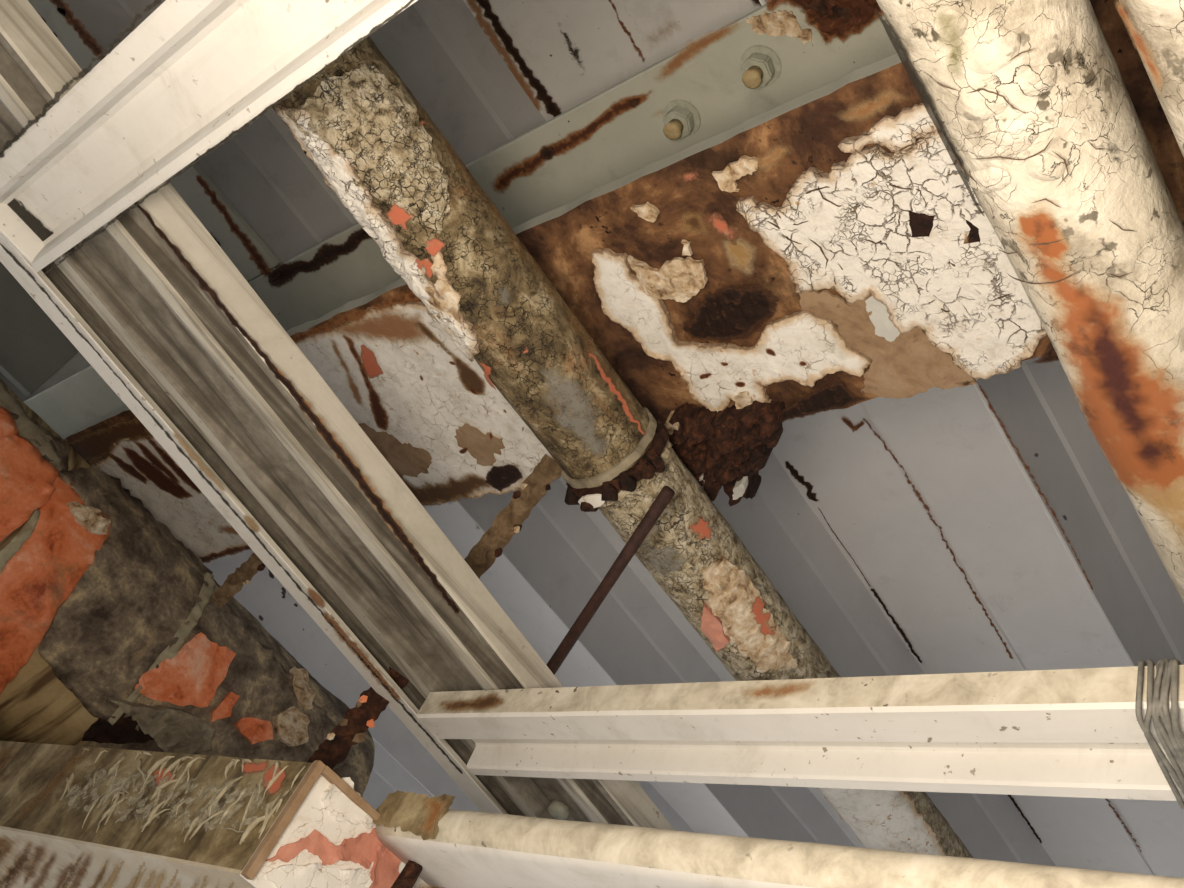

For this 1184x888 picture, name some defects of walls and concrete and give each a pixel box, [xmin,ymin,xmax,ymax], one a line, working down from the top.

rust [746,0,883,47]
crack [925,72,1027,114]
crack [948,138,1069,208]
peeling [274,63,554,506]
peeling [592,103,1047,413]
crack [999,239,1078,284]
rust [134,201,485,613]
rust [664,382,864,506]
rust [1019,213,1184,537]
leakage [0,840,124,888]
leakage [127,862,179,888]
peeling [265,777,401,888]